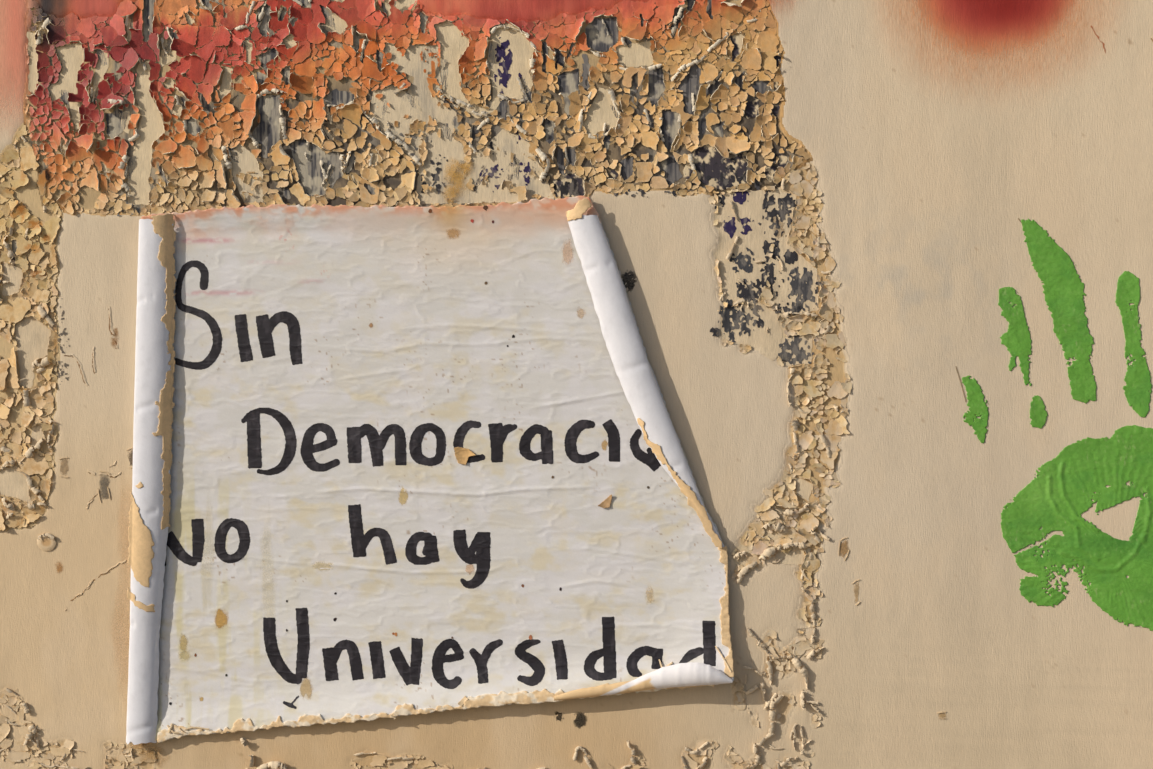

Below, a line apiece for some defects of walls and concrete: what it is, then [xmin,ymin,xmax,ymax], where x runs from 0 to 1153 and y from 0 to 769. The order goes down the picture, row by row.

peeling [0,0,854,769]